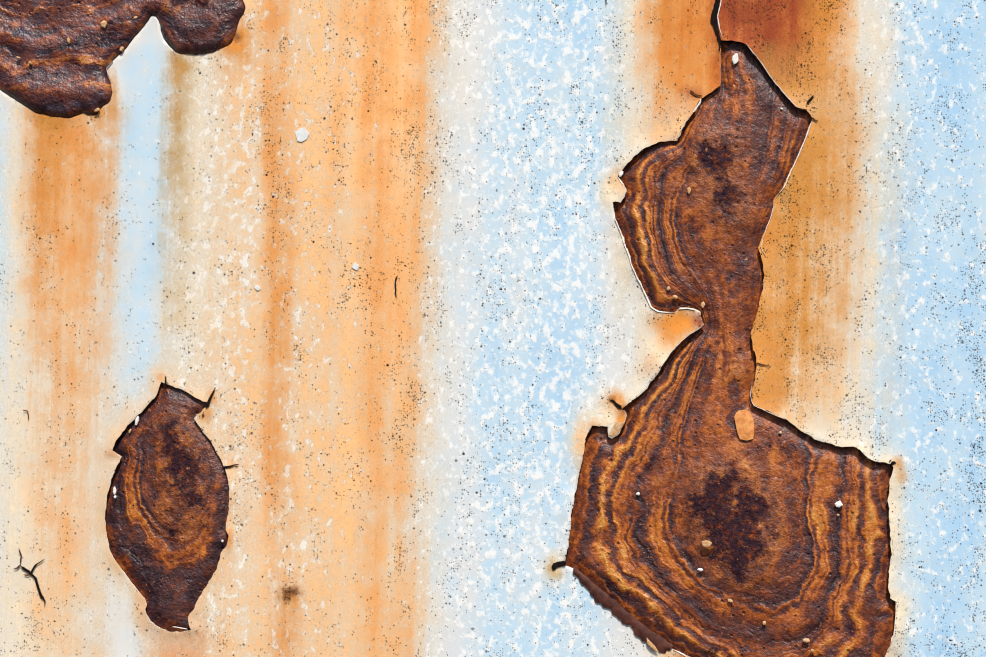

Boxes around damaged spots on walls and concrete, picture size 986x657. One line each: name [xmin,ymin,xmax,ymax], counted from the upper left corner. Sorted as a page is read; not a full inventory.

peeling [0,0,245,118]
crack [710,0,722,51]
corrosion [601,160,631,207]
corrosion [0,91,127,657]
corrosion [151,0,443,657]
corrosion [571,393,637,464]
peeling [565,40,897,657]
corrosion [623,0,907,657]
peeling [105,382,229,632]
crack [14,549,46,606]
corrosion [133,588,147,625]